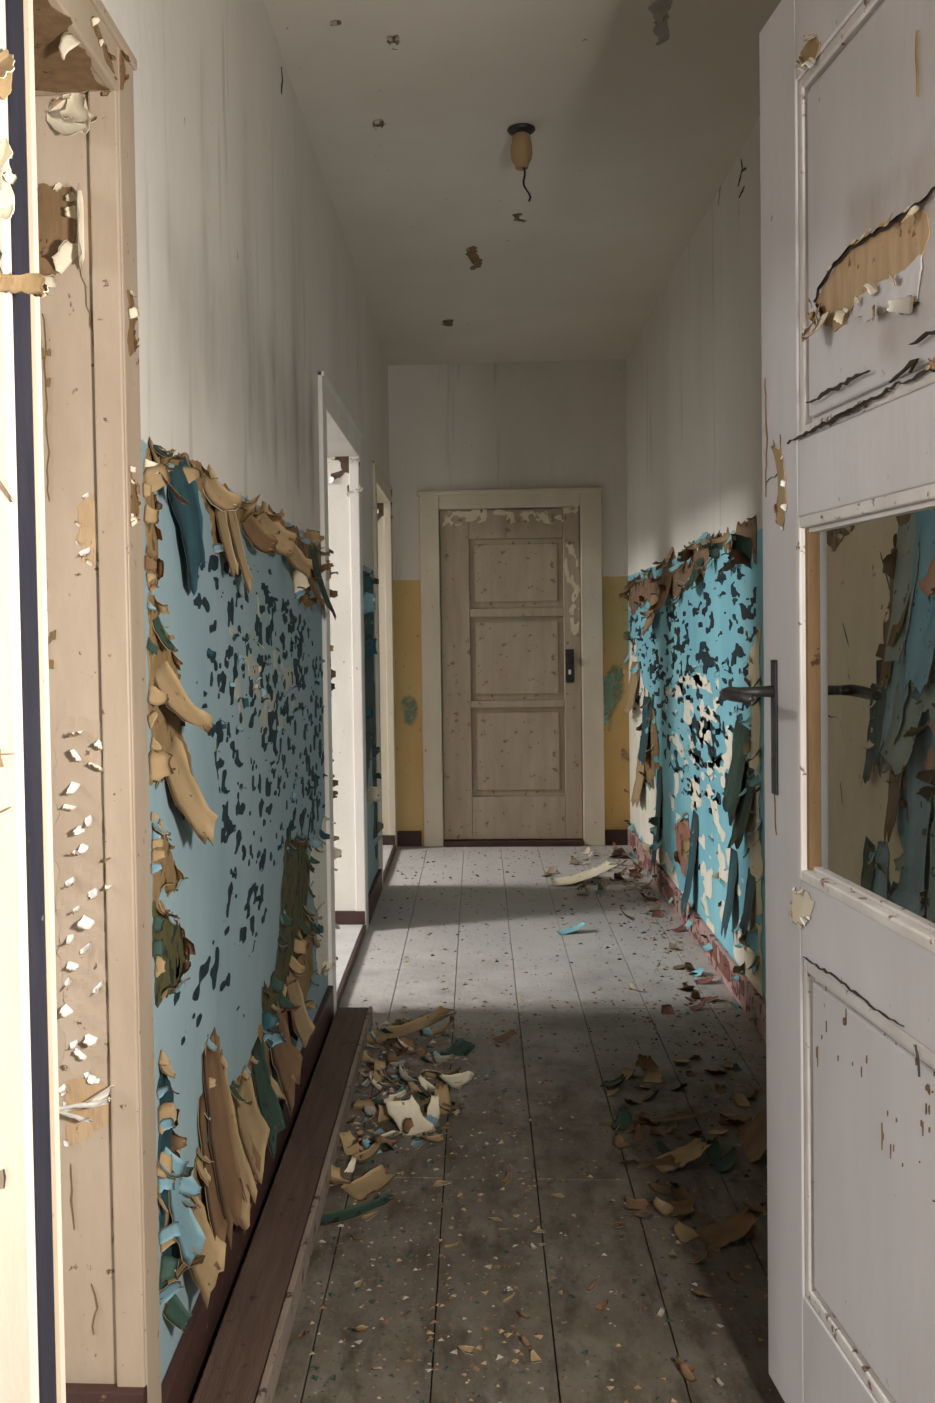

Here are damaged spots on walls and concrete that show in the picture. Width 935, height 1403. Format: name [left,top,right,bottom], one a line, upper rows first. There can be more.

peeling [0,49,15,100]
peeling [33,0,131,136]
peeling [0,136,17,221]
peeling [37,182,85,287]
peeling [801,205,930,342]
peeling [442,505,579,526]
peeling [769,440,788,531]
peeling [541,516,764,1021]
peeling [827,516,935,903]
peeling [129,437,342,1333]
crack [803,956,920,1077]
peeling [920,1071,935,1136]